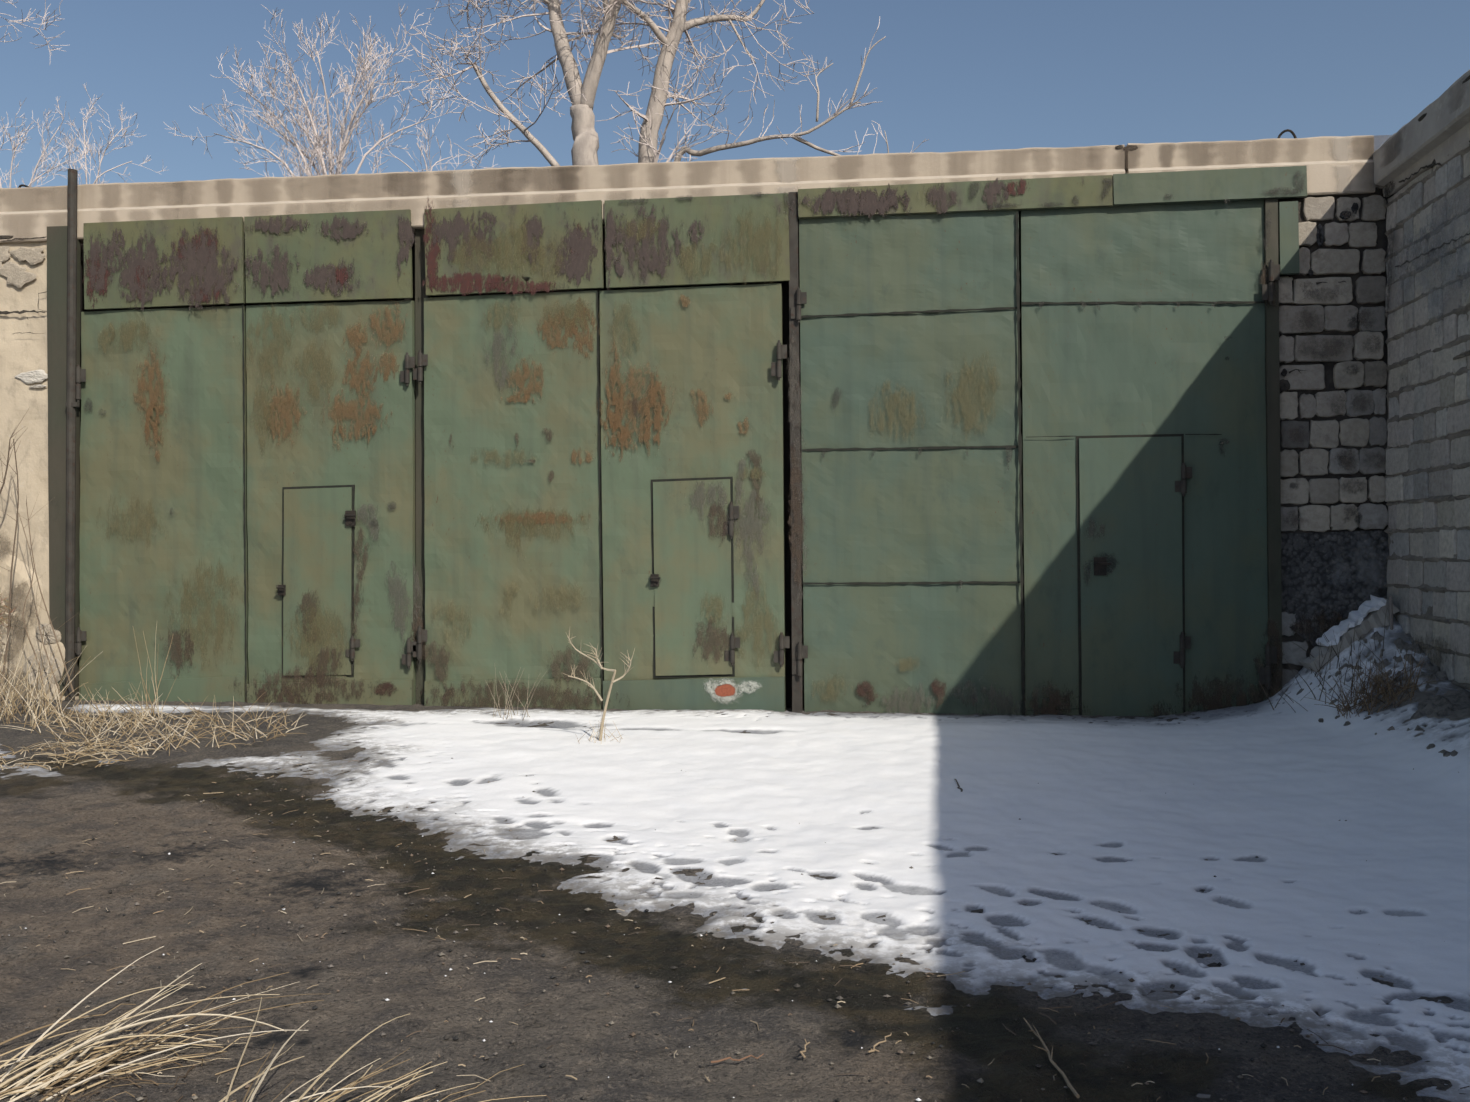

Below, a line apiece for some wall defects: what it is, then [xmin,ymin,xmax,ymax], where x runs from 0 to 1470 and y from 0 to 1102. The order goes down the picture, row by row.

spalling [0,235,45,288]
rust [82,215,368,312]
rust [396,196,705,296]
rust [779,178,1029,218]
rust [234,647,394,704]
rust [388,561,618,710]